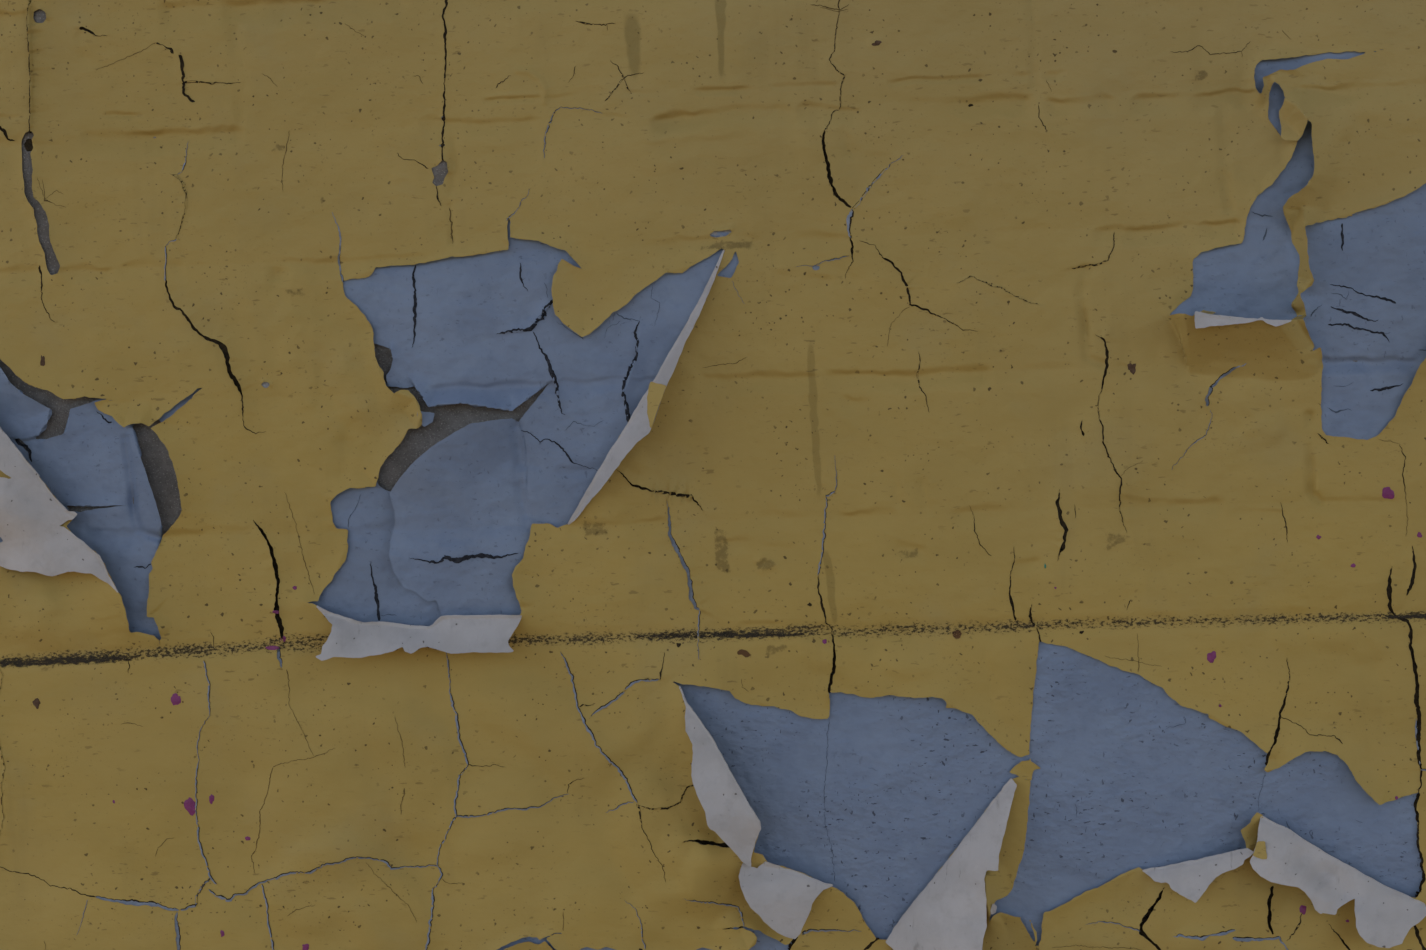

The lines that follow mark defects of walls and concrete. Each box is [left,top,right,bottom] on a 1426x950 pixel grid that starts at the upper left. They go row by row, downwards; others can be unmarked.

crack [0,1,64,207]
peeling [0,359,202,644]
crack [164,143,263,434]
crack [398,0,453,244]
peeling [308,219,739,661]
crack [797,0,974,412]
crack [1080,335,1247,530]
peeling [1170,49,1426,440]
crack [1,469,744,950]
peeling [497,933,561,950]
peeling [674,641,1426,950]
crack [1382,440,1426,950]